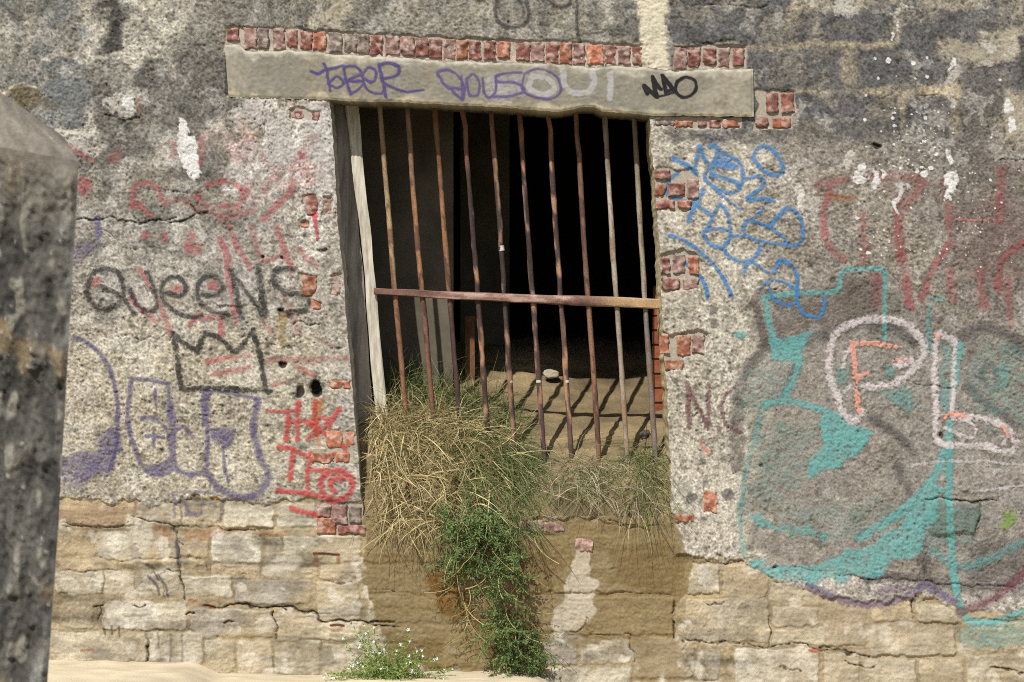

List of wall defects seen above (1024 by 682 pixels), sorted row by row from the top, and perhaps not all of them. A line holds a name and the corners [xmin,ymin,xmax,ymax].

spalling [655,89,796,131]
peeling [177,117,202,180]
spalling [653,167,700,213]
crack [81,187,217,250]
spalling [659,249,702,294]
spalling [313,502,366,536]
crack [67,517,388,639]